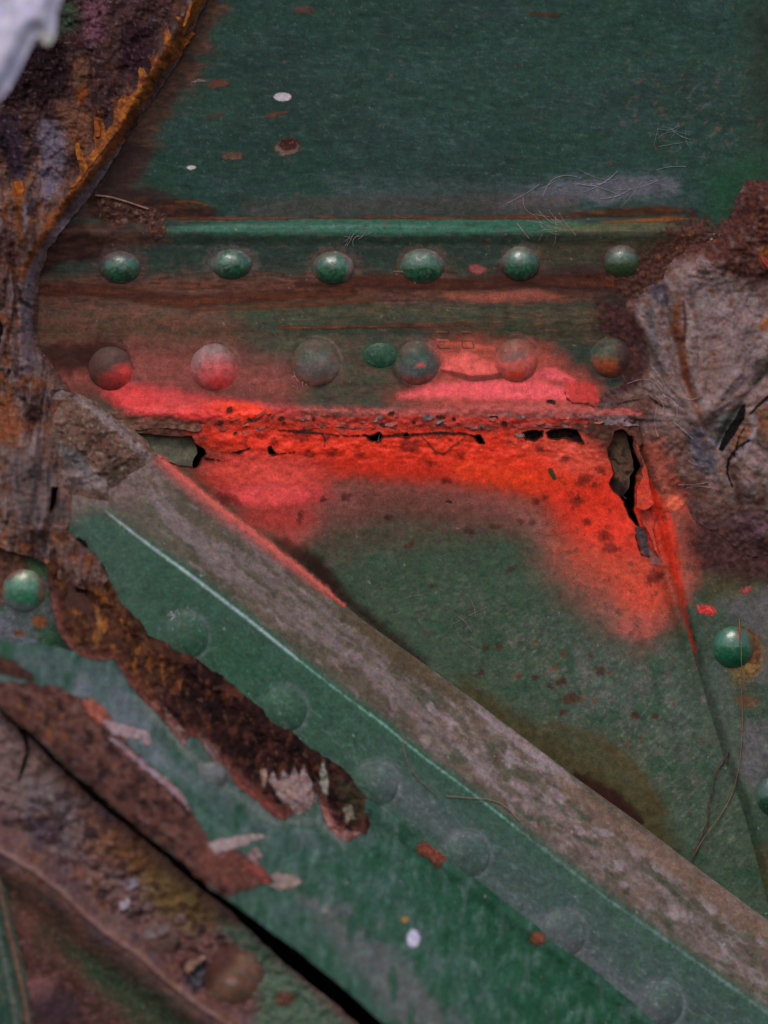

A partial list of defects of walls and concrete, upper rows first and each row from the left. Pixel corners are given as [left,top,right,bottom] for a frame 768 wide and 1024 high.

corrosion [68,0,204,189]
crack [204,448,250,461]
corrosion [214,406,327,437]
corrosion [335,408,398,435]
crack [278,429,474,455]
corrosion [411,414,456,439]
corrosion [470,400,570,437]
corrosion [285,545,382,630]